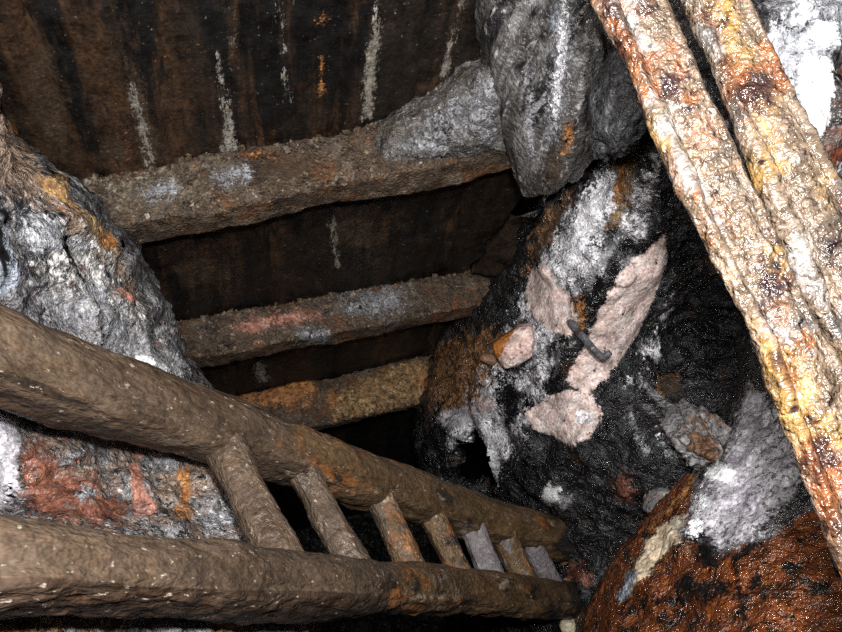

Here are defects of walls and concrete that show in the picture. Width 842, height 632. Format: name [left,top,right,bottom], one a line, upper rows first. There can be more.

efflorescence [359,5,382,121]
efflorescence [383,1,503,163]
corrosion [560,123,575,156]
corrosion [823,145,842,170]
corrosion [603,142,645,232]
corrosion [531,208,565,259]
corrosion [569,293,588,329]
corrosion [610,467,639,503]
corrosion [566,559,594,588]